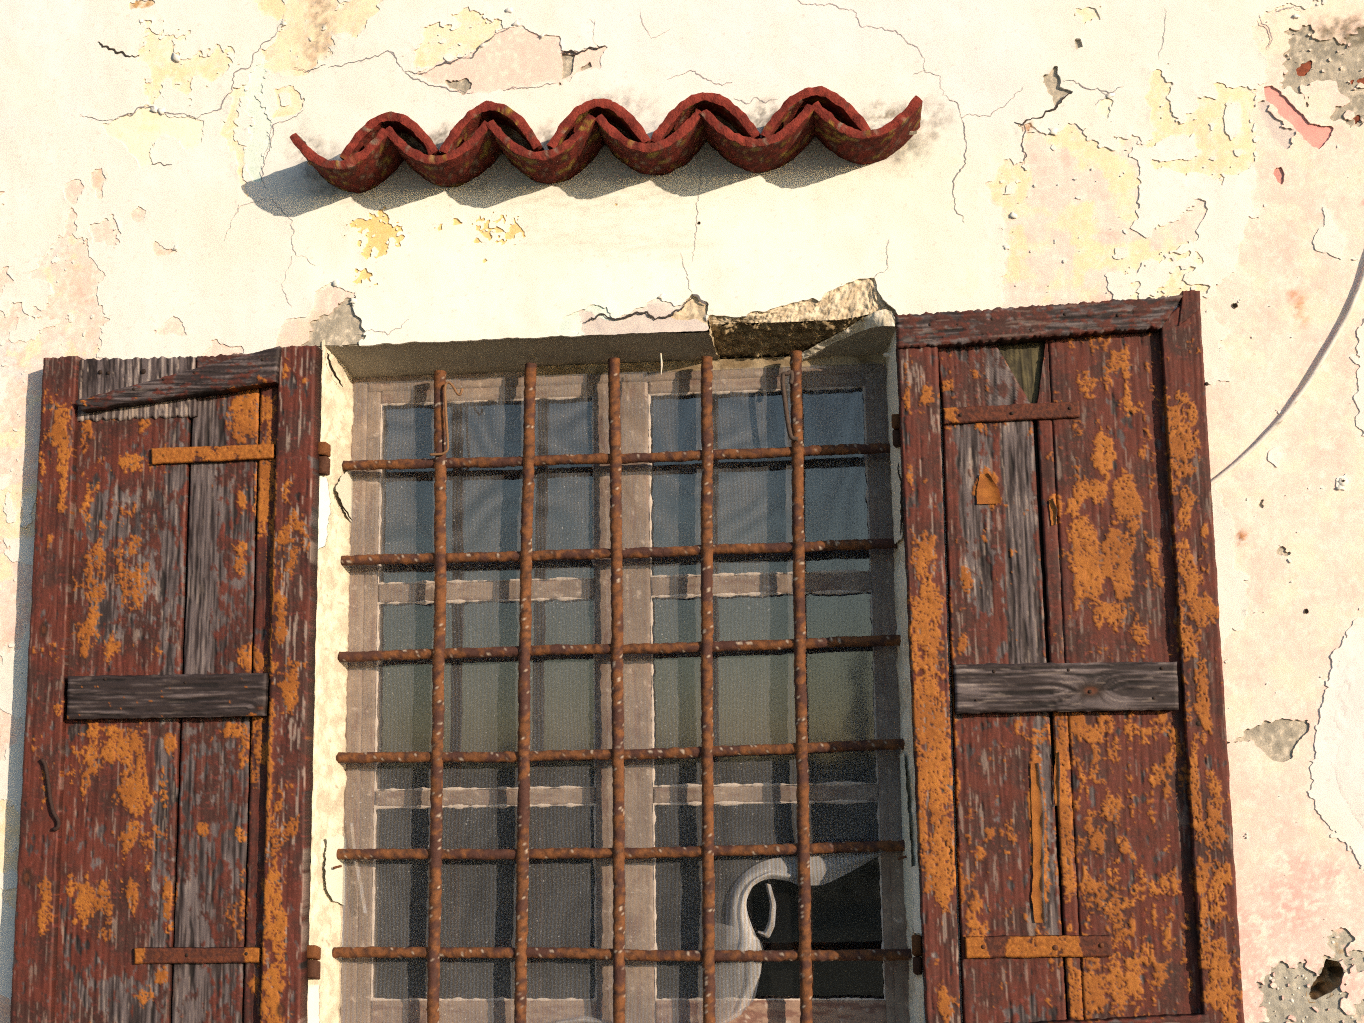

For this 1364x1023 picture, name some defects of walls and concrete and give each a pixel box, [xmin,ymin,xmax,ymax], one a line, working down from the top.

peeling [412,7,607,95]
crack [798,0,1119,222]
peeling [434,212,526,245]
spalling [557,278,897,361]
peeling [0,169,146,665]
peeling [984,0,1364,1023]
peeling [0,709,24,761]
peeling [0,799,20,873]